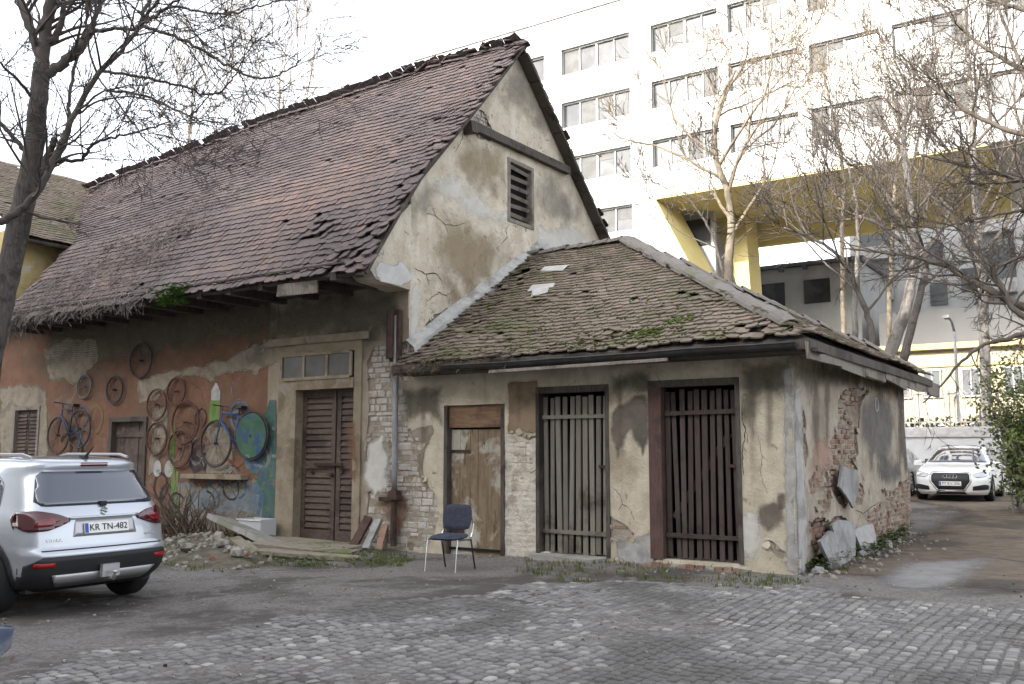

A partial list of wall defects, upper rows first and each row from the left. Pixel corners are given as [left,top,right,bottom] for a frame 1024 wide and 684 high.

crack [415,268,458,304]
peeling [0,337,99,458]
peeling [137,339,275,476]
flaking render [364,284,441,551]
flaking render [504,428,552,557]
leakage [611,374,649,455]
leakage [743,494,785,557]
leakage [741,365,908,480]
flaking render [802,386,912,553]